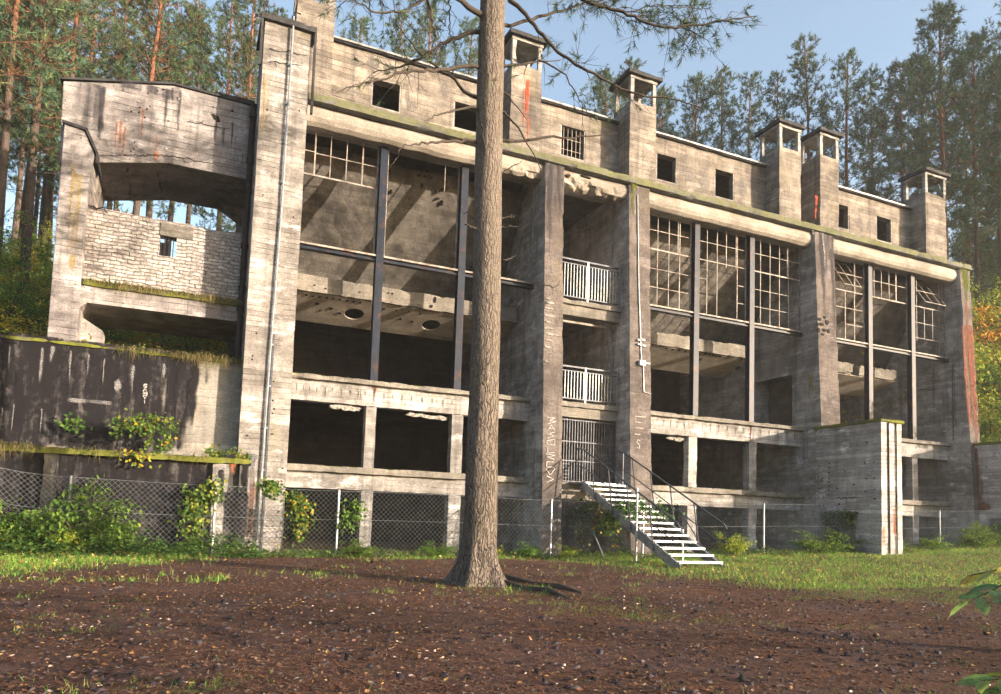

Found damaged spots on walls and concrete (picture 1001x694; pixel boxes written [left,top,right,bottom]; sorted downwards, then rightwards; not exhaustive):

water stain [83,86,106,133]
corrosion [962,303,977,434]
water stain [0,331,257,551]